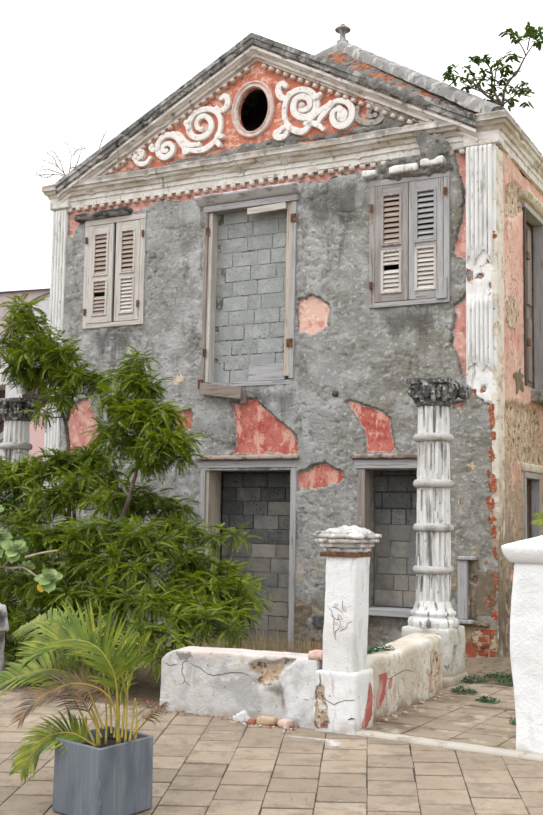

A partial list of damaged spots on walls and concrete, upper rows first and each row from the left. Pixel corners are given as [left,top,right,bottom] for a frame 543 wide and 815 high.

peeling [298,295,330,335]
peeling [452,296,486,410]
peeling [68,399,99,452]
peeling [232,398,298,455]
peeling [348,401,398,453]
peeling [298,463,345,489]
spalling [468,369,543,658]
spalling [293,600,324,639]
crack [164,661,249,686]
spalling [249,657,296,685]
spalling [314,683,329,728]
peeling [362,673,404,728]